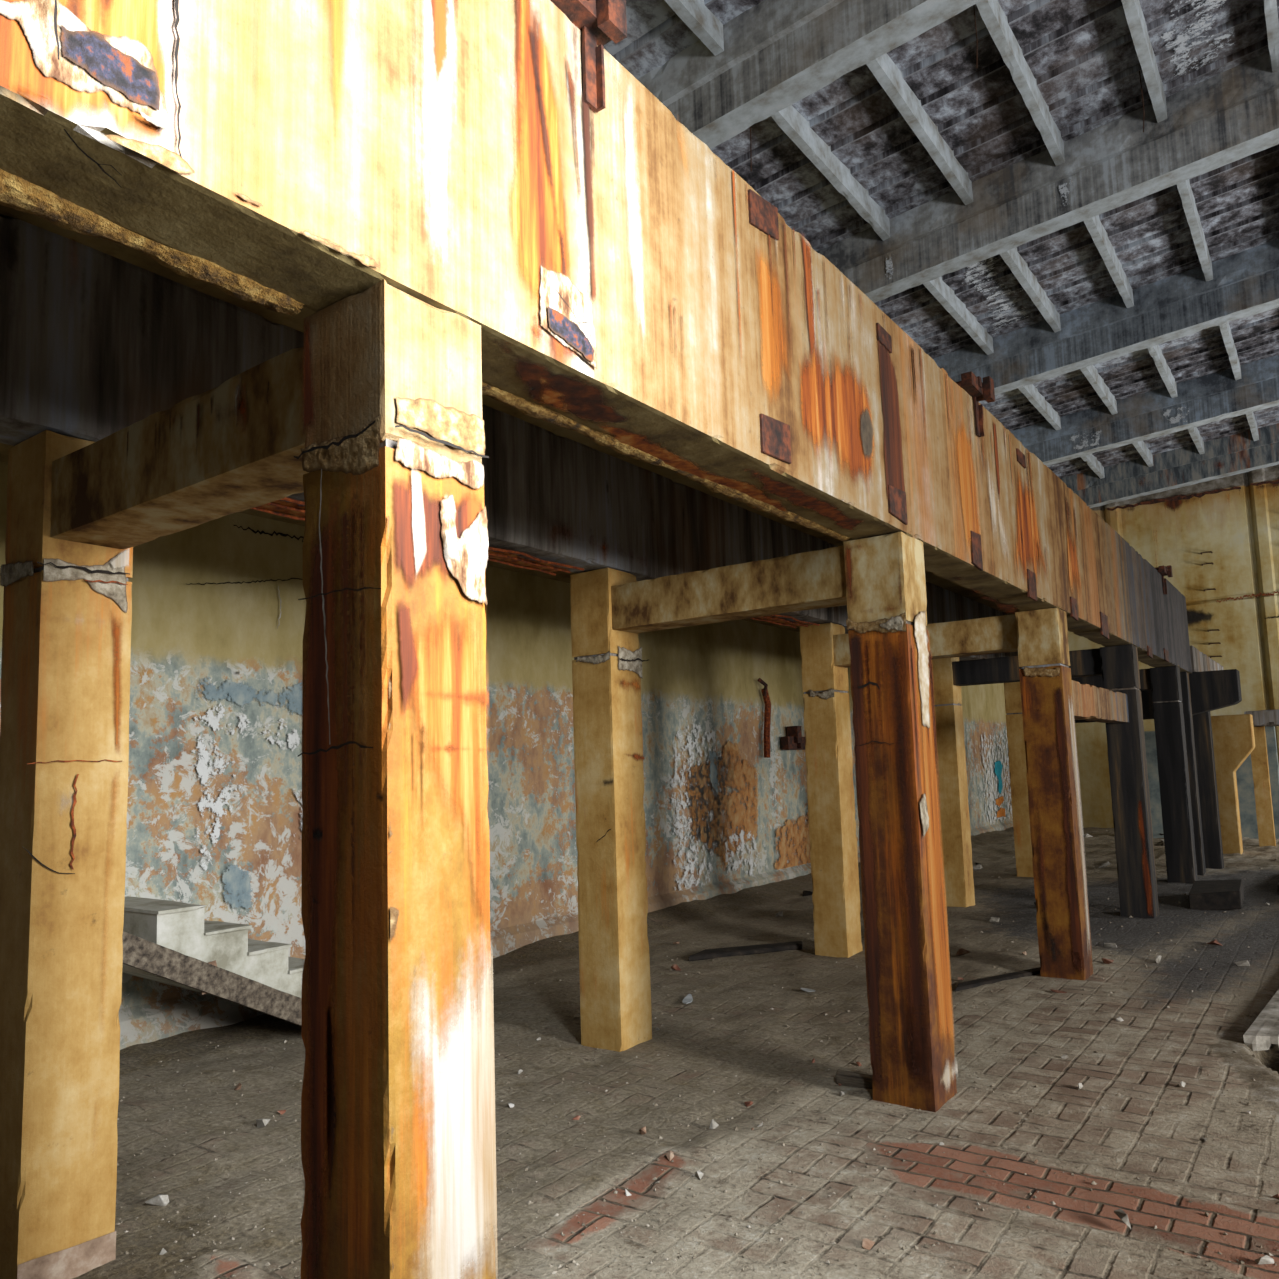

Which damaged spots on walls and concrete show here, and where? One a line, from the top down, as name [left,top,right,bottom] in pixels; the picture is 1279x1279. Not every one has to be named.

spalling [0,0,171,132]
spalling [105,135,195,174]
rust [510,0,596,298]
spalling [540,265,597,369]
rust [758,224,926,500]
spalling [294,397,489,489]
rust [394,473,482,586]
spalling [440,495,584,605]
crack [28,757,122,765]
crack [22,846,75,874]
rust [302,495,367,1279]
rust [850,635,953,1082]